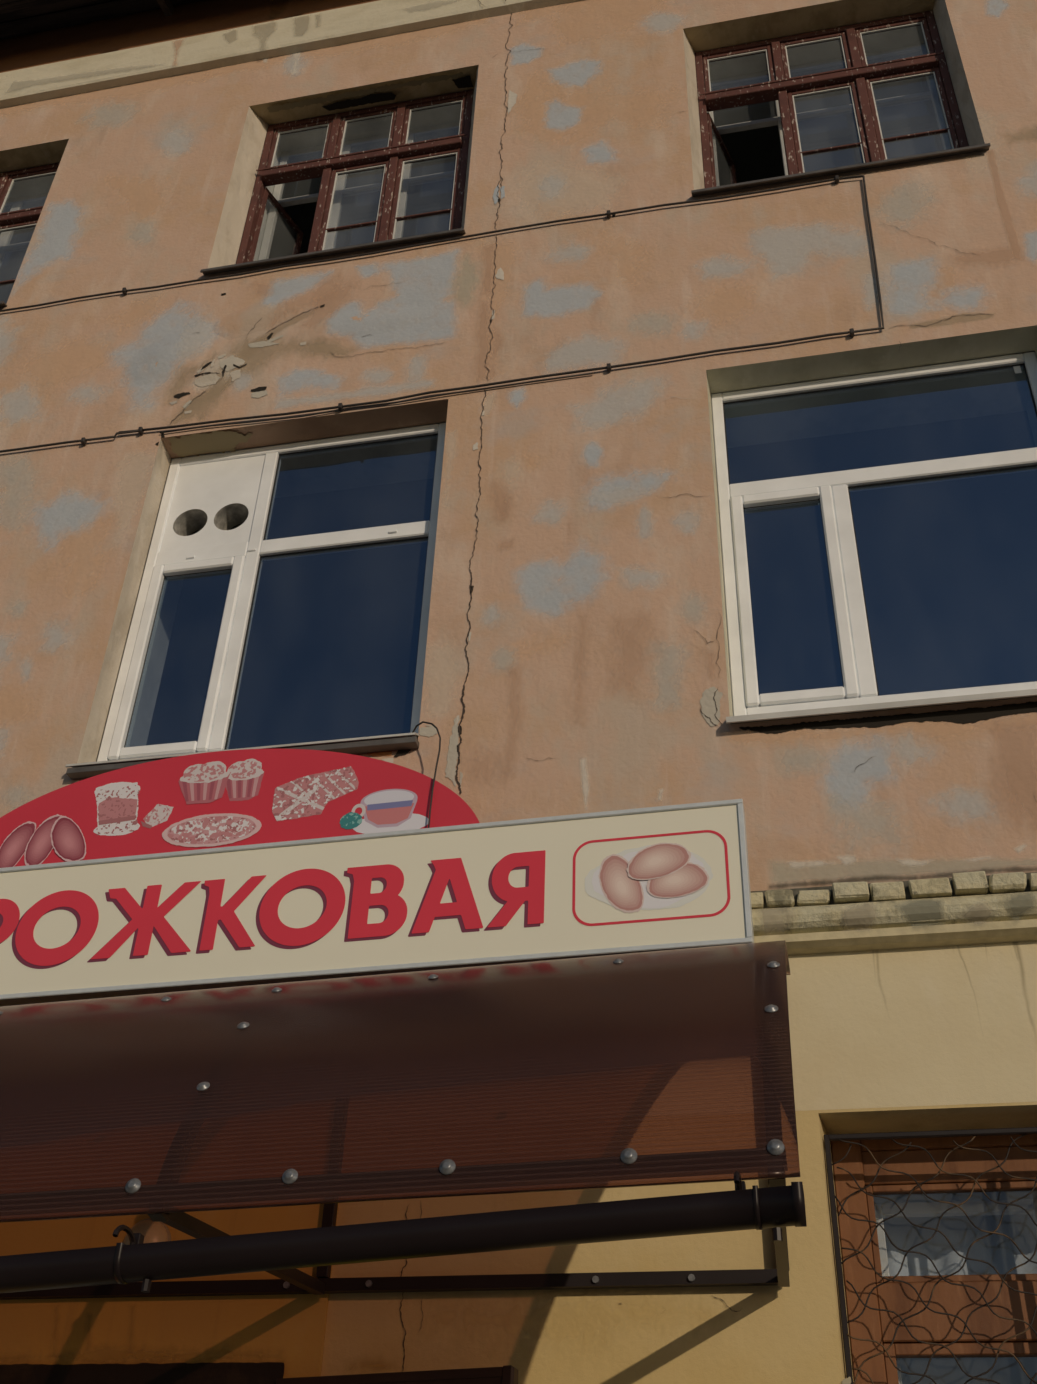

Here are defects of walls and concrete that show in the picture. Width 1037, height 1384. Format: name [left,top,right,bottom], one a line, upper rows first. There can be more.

peeling [265,273,329,304]
peeling [170,333,338,414]
crack [455,0,544,794]
flaking render [739,701,1037,734]
peeling [827,747,888,810]
crack [400,1260,423,1369]